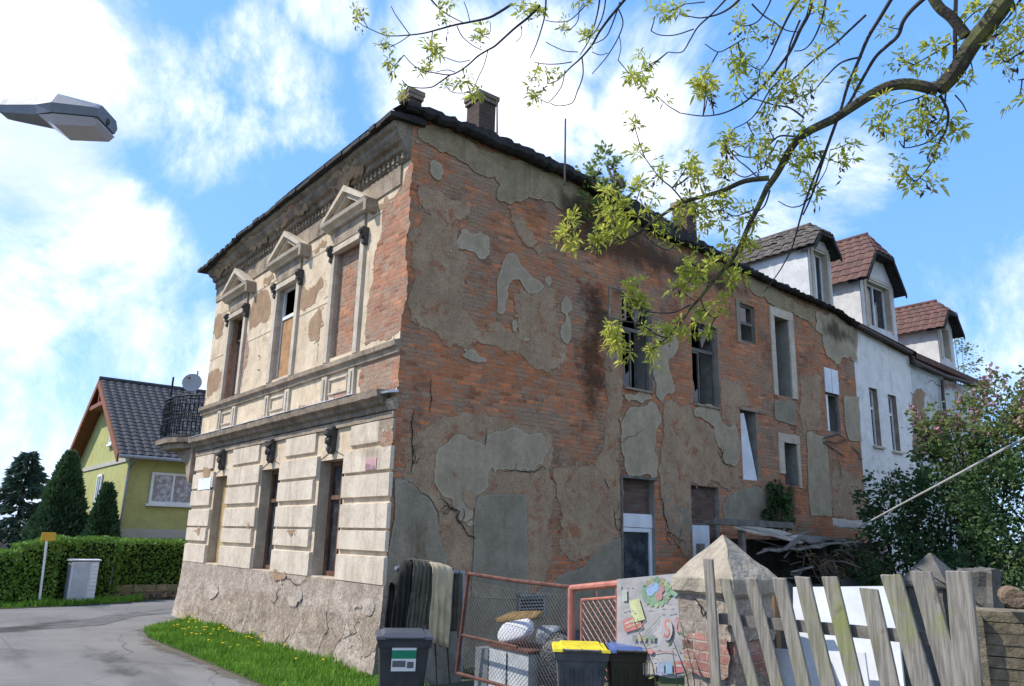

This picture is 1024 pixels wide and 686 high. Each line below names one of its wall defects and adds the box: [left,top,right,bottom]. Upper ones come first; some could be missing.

flaking render [358,124,587,392]
leakage [563,196,732,291]
flaking render [212,314,224,339]
flaking render [241,274,274,385]
flaking render [300,277,325,345]
crack [411,379,482,545]
flaking render [379,325,780,669]
crack [660,491,686,549]
flaking render [807,431,864,520]
flaking render [844,396,861,441]